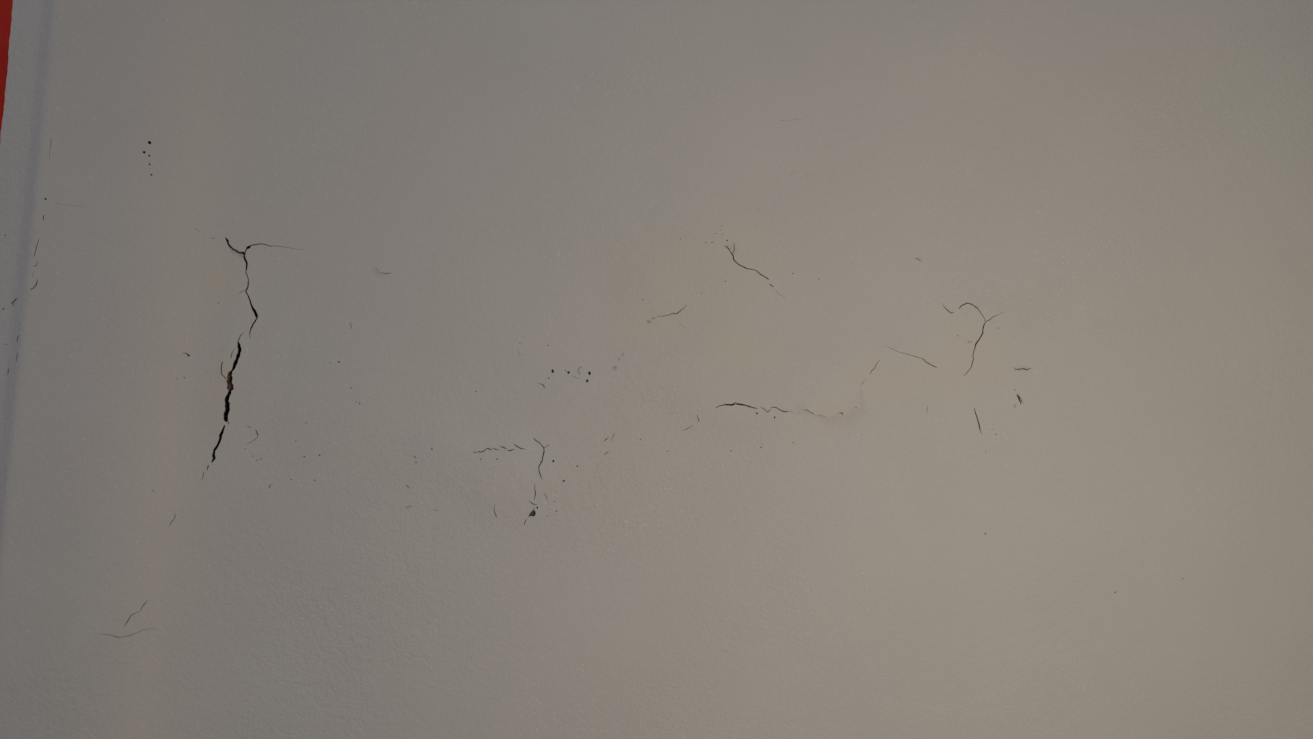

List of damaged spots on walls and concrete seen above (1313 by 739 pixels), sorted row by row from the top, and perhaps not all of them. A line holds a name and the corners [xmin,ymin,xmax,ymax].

crack [726,244,782,296]
crack [202,237,300,479]
crack [861,303,1001,385]
crack [474,439,548,505]